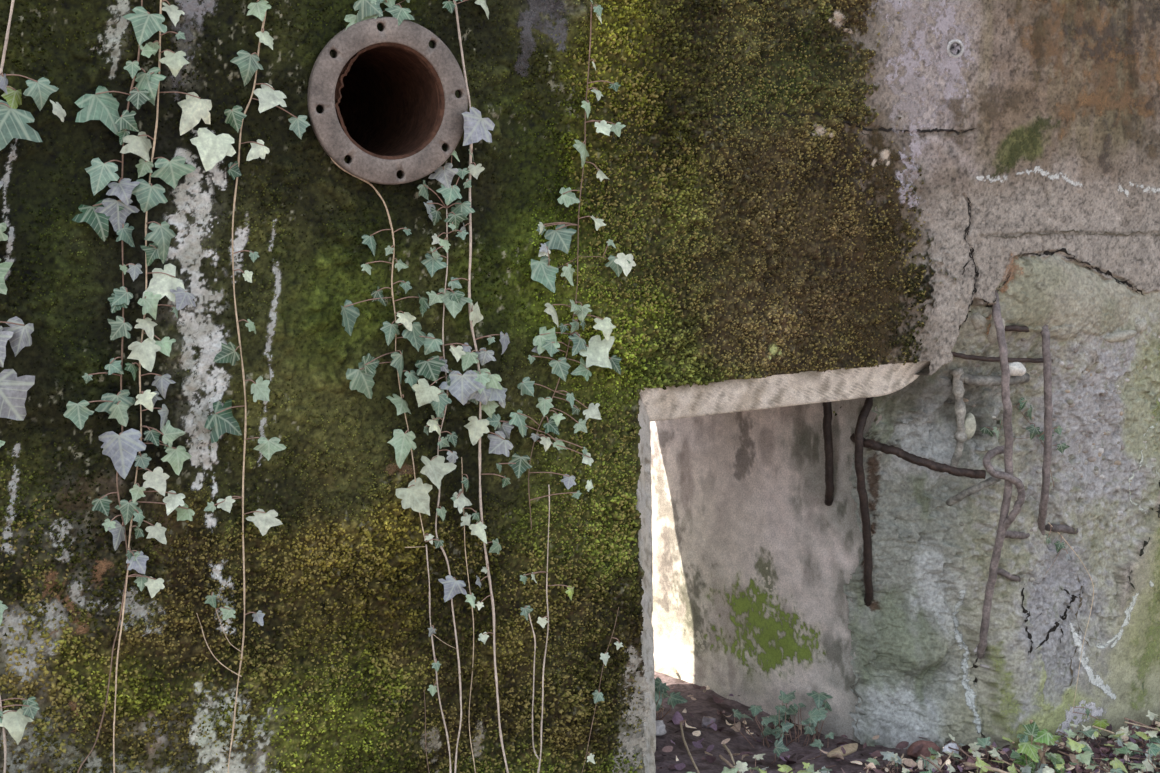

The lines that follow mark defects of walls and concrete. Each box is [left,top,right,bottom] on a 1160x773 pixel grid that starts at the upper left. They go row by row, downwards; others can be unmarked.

corrosion [335,42,445,160]
crack [672,110,976,151]
damp [976,166,1082,186]
damp [1118,182,1160,197]
crack [957,197,1160,338]
damp [168,149,249,499]
damp [205,514,216,528]
damp [211,560,235,634]
damp [755,553,776,592]
corrosion [867,433,879,537]
spalling [843,251,1160,753]
crack [1128,417,1160,589]